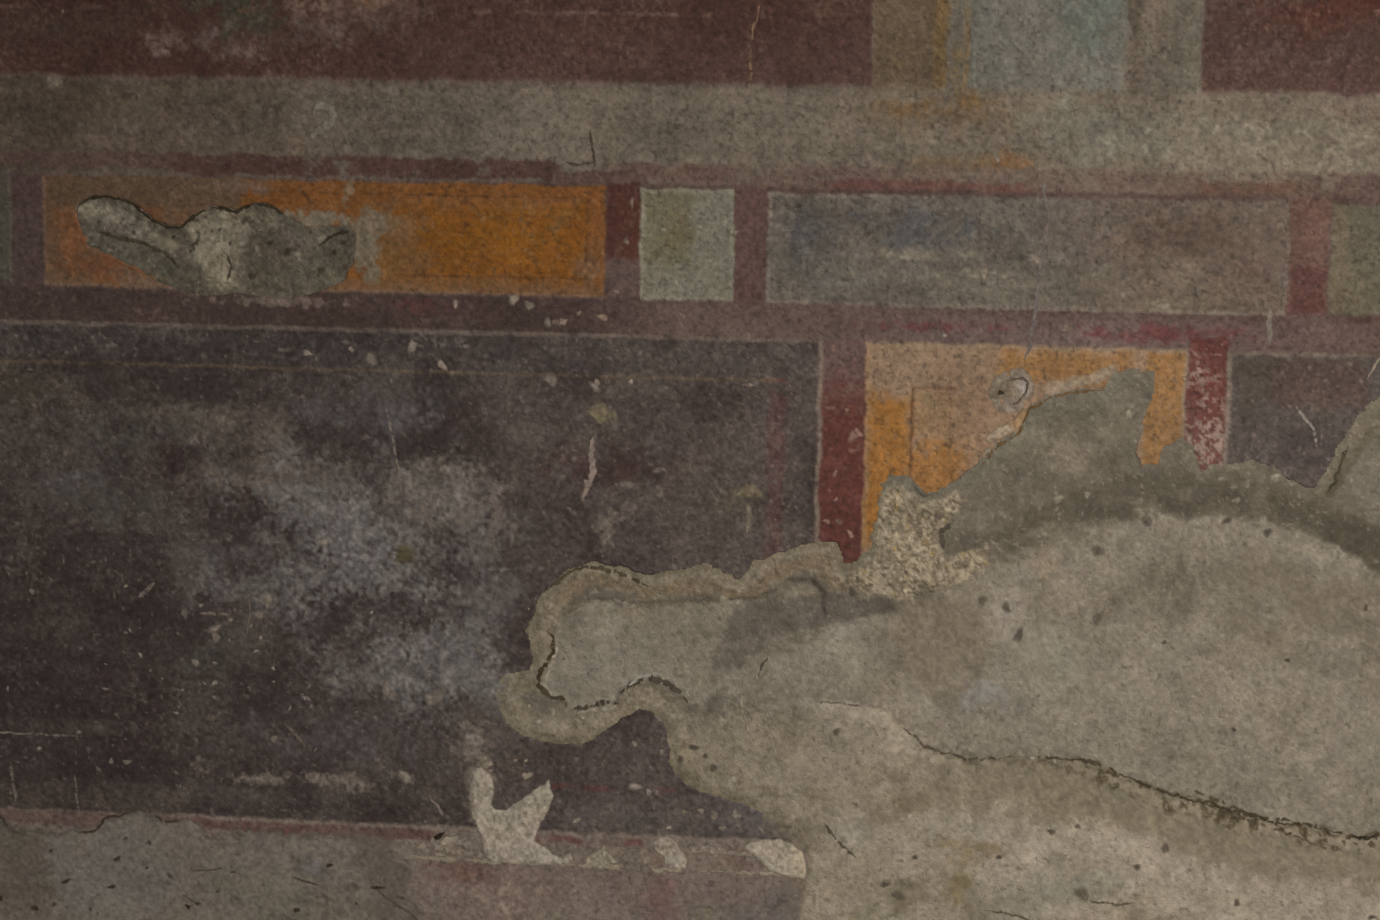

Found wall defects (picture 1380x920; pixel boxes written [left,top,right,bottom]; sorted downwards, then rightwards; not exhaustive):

flaking render [76,195,356,299]
peeling [509,296,534,309]
peeling [544,311,607,328]
peeling [208,618,233,642]
flaking render [496,366,1380,920]